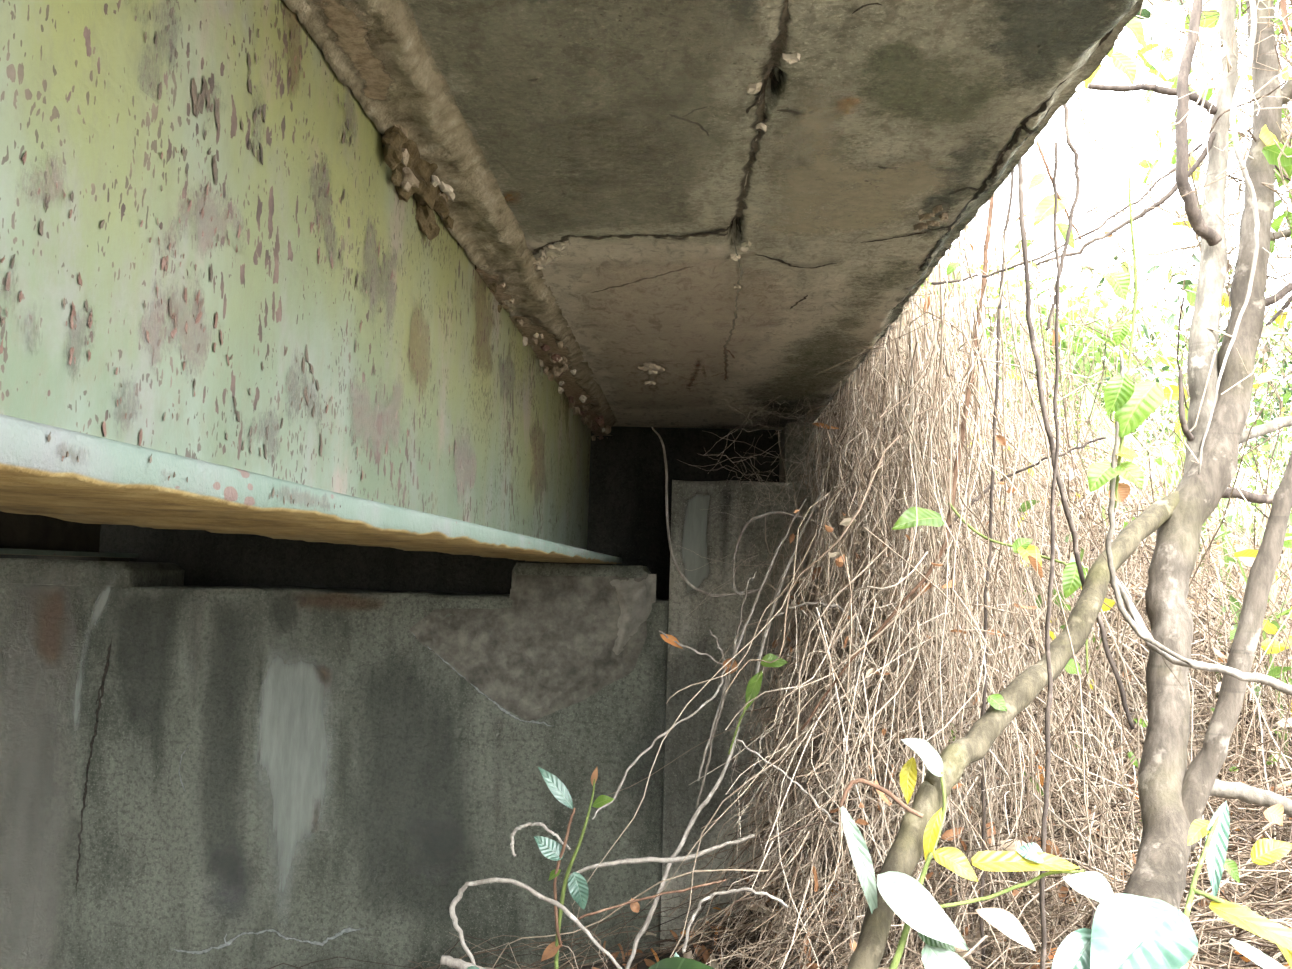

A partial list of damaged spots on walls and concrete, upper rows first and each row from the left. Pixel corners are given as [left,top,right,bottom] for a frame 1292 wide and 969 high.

crack [852,3,881,14]
crack [1089,28,1114,58]
peeling [179,77,241,253]
peeling [430,175,455,202]
crack [533,0,836,380]
crack [861,79,1067,274]
peeling [63,272,93,366]
peeling [140,218,233,365]
peeling [226,345,333,466]
water stain [0,574,117,969]
crack [76,636,113,895]
water stain [257,652,333,898]